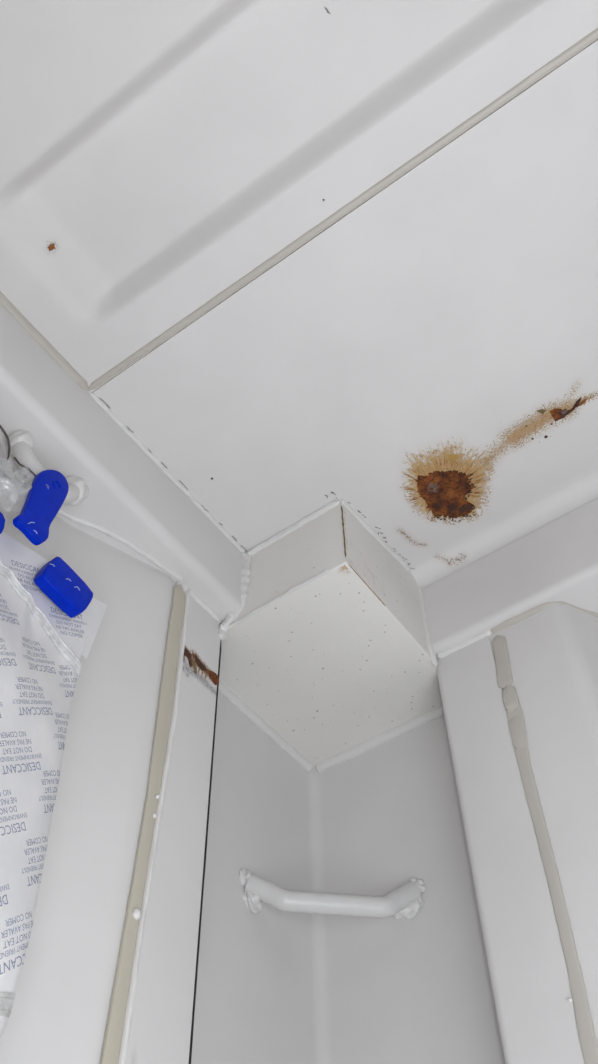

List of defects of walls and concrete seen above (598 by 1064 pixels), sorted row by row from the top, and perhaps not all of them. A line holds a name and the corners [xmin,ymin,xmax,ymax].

rust [401,381,598,525]
rust [183,646,219,685]